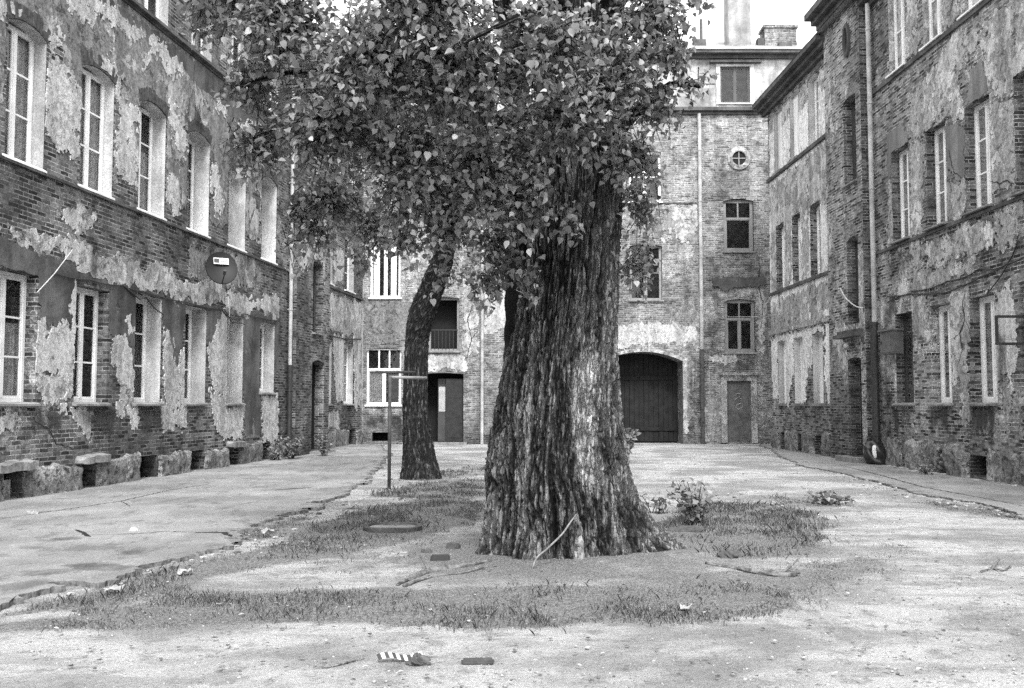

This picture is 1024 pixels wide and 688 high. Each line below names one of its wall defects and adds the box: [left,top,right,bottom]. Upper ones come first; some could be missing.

flaking render [0,0,284,444]
flaking render [618,321,721,442]
flaking render [884,0,1024,441]